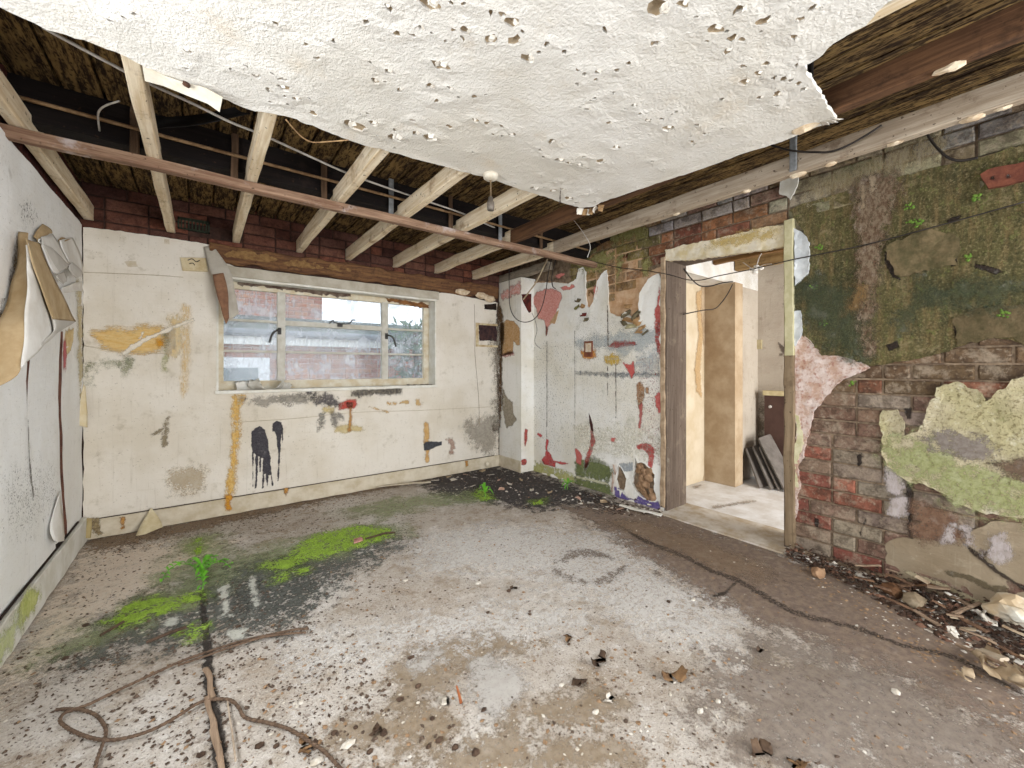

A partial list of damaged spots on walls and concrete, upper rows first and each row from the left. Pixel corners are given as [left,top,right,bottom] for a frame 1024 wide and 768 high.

peeling [485,10,548,64]
peeling [647,0,689,15]
peeling [705,24,745,54]
peeling [740,61,809,106]
peeling [223,249,352,272]
peeling [484,282,521,310]
flaking render [501,107,1024,511]
leakage [801,130,952,359]
rust [224,394,245,510]
flaking render [794,335,1024,576]
leakage [0,530,415,711]
crack [620,526,1024,695]